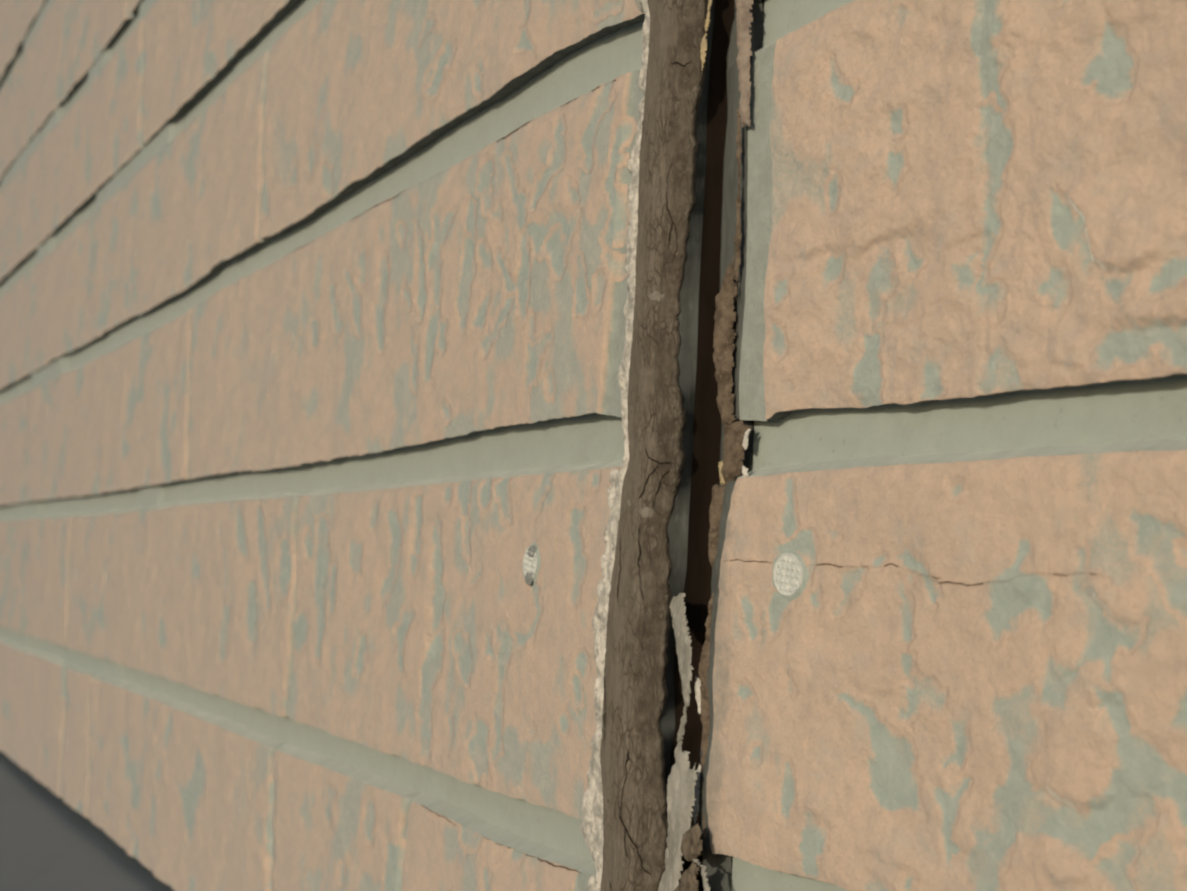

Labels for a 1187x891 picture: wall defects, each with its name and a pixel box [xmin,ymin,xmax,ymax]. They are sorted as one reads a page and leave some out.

peeling [1077,7,1138,106]
peeling [580,0,650,891]
crack [666,163,677,259]
spalling [670,0,734,891]
peeling [847,228,928,408]
peeling [877,101,910,199]
peeling [916,352,950,402]
peeling [943,0,1034,395]
peeling [1034,182,1187,377]
crack [808,563,1102,586]
peeling [1125,502,1187,625]
peeling [950,529,1187,891]